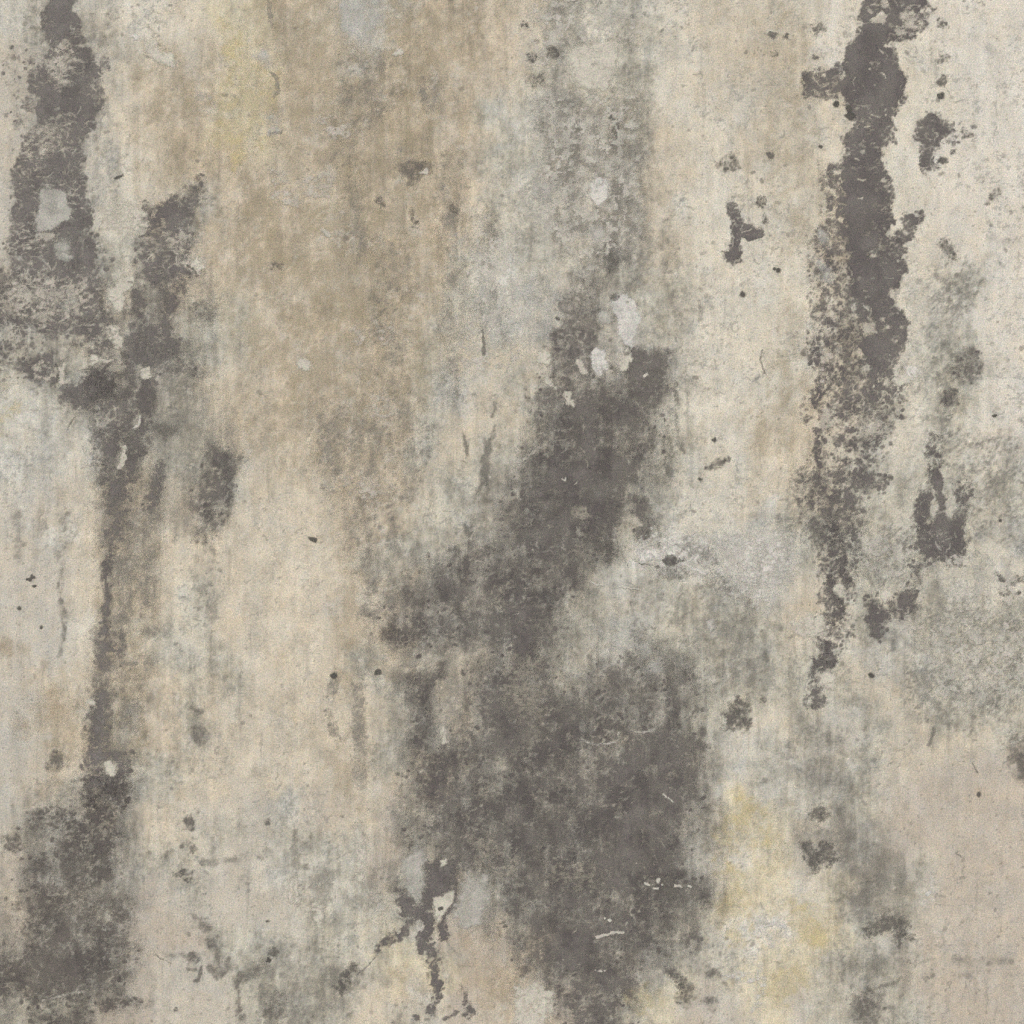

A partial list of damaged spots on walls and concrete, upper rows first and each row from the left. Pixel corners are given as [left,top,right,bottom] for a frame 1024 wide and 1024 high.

leakage [0,0,204,1024]
leakage [190,448,238,533]
leakage [362,292,796,1024]
leakage [724,202,764,264]
leakage [797,0,974,709]